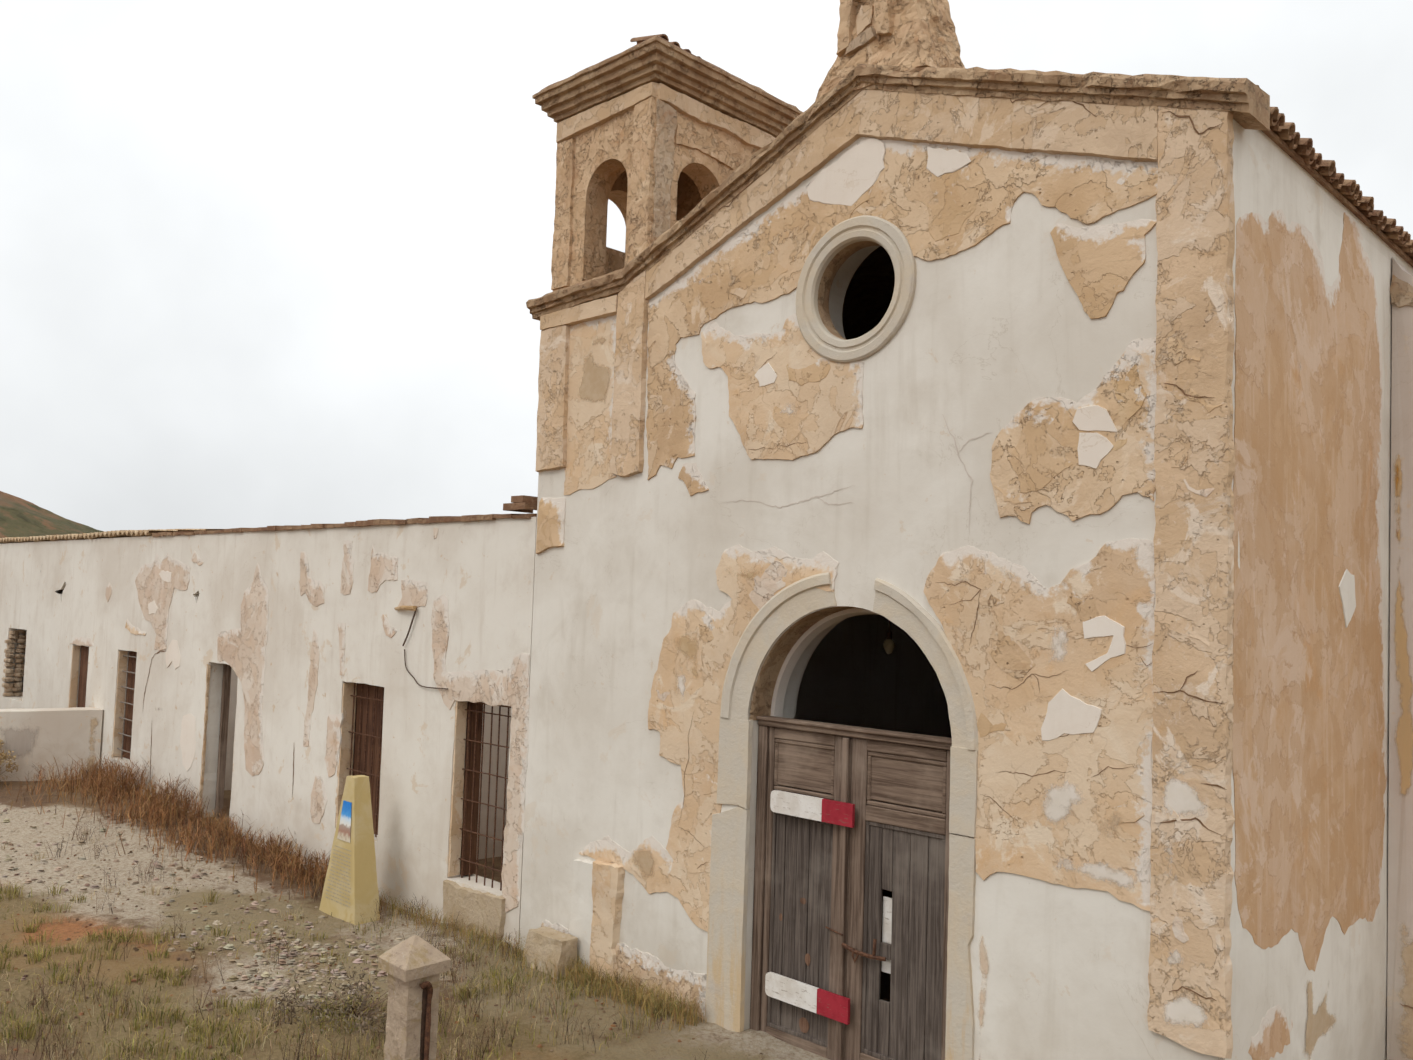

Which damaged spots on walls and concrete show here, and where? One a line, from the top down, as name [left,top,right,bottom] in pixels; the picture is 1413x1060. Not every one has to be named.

flaking render [125,550,204,669]
flaking render [217,563,269,776]
flaking render [300,540,530,913]
flaking render [535,315,617,554]
flaking render [579,544,839,932]
crack [722,485,853,508]
flaking render [646,137,1158,496]
flaking render [923,538,1156,911]
flaking render [990,337,1214,524]
flaking render [1187,209,1413,972]
flaking render [1248,1004,1293,1060]